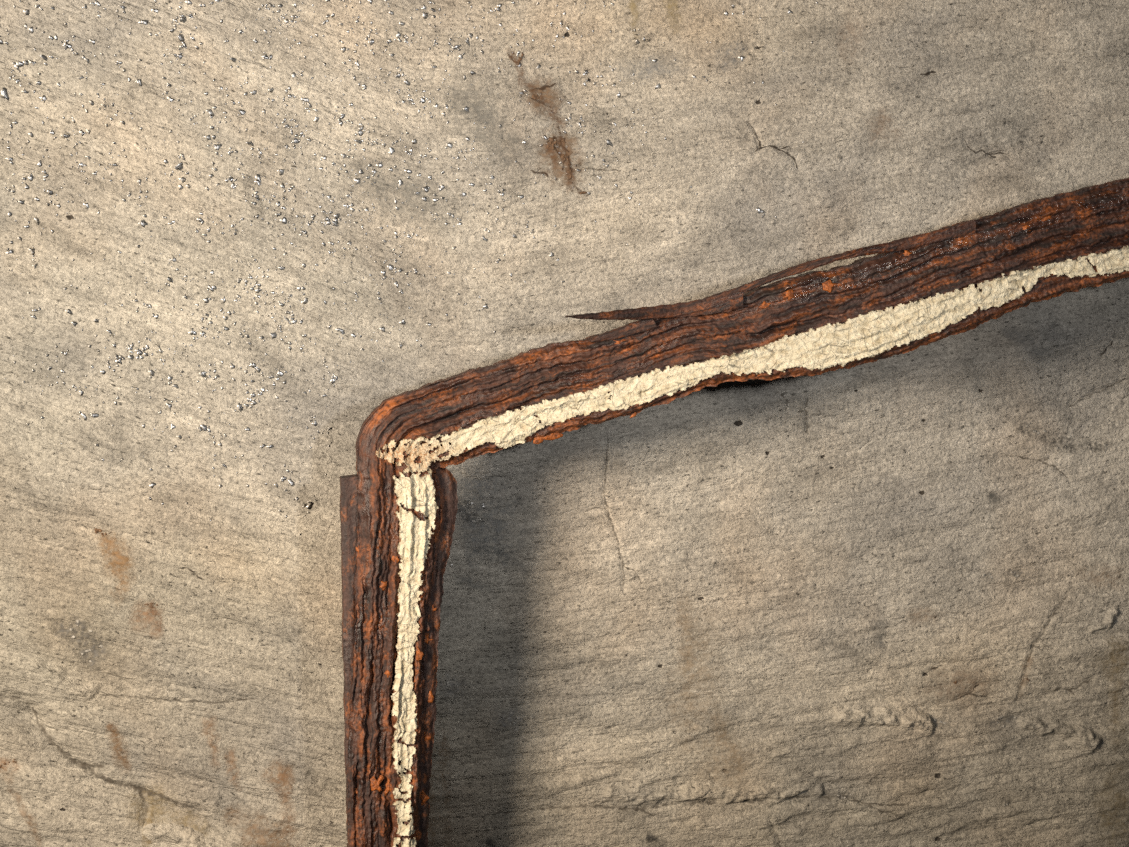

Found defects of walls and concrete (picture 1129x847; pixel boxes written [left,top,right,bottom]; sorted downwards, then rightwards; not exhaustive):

rust [531,126,587,194]
rust [339,178,1129,847]
crack [12,696,192,826]